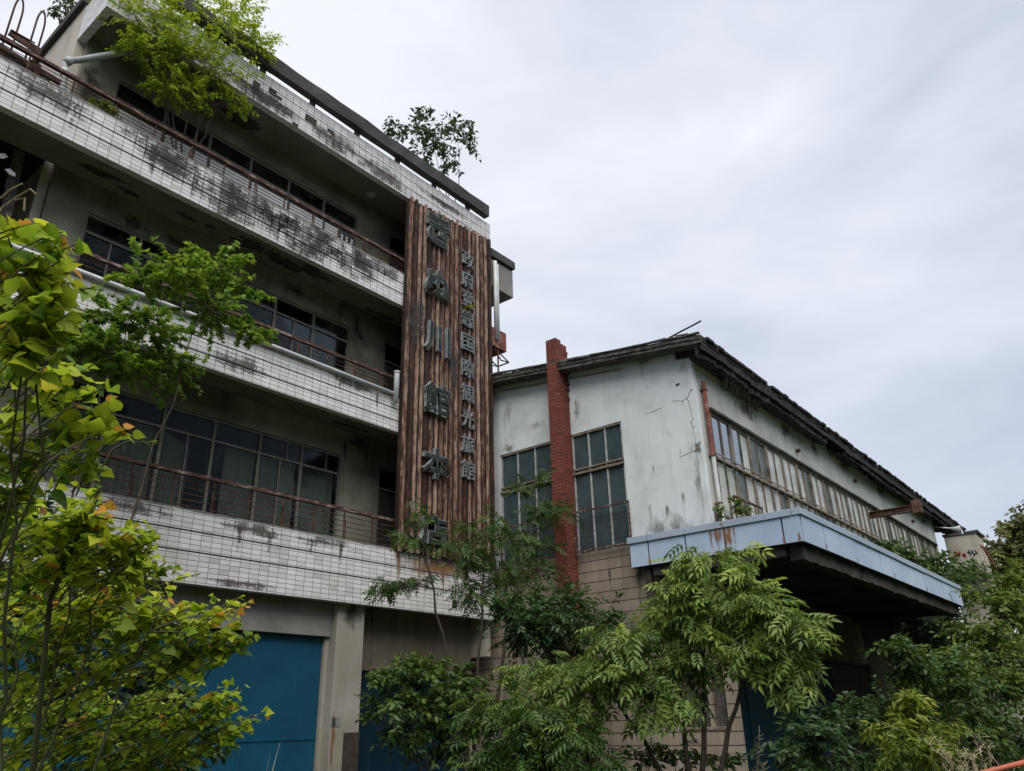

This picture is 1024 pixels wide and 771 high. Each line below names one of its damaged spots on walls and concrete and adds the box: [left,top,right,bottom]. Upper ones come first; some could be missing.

damp [120,125,407,281]
rust [709,523,735,550]
rust [397,553,464,584]